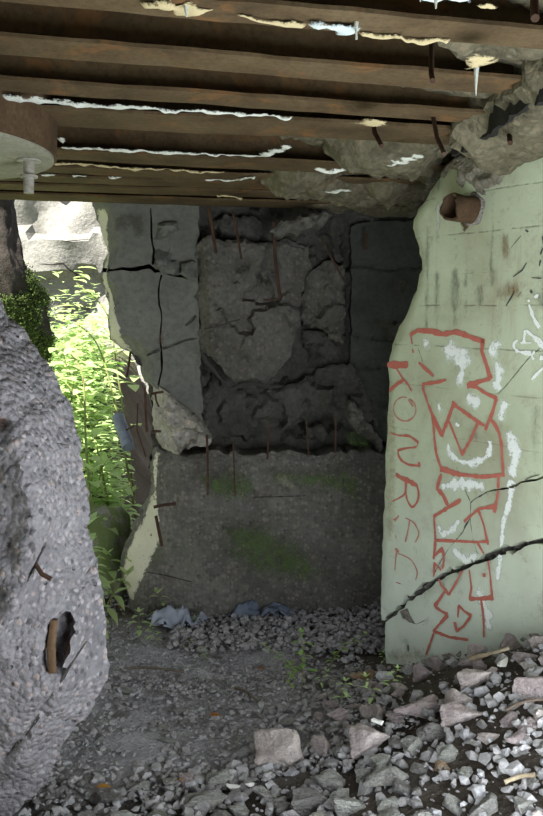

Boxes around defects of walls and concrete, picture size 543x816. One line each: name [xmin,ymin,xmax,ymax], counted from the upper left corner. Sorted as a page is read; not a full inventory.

damp [141,1,213,17]
spalling [507,0,543,17]
damp [240,15,450,45]
spalling [437,41,543,69]
spalling [420,88,494,99]
damp [3,95,292,121]
crack [451,88,543,157]
damp [58,138,292,157]
spalling [285,145,505,218]
crack [41,263,80,279]
crack [102,215,240,385]
crack [382,475,543,624]